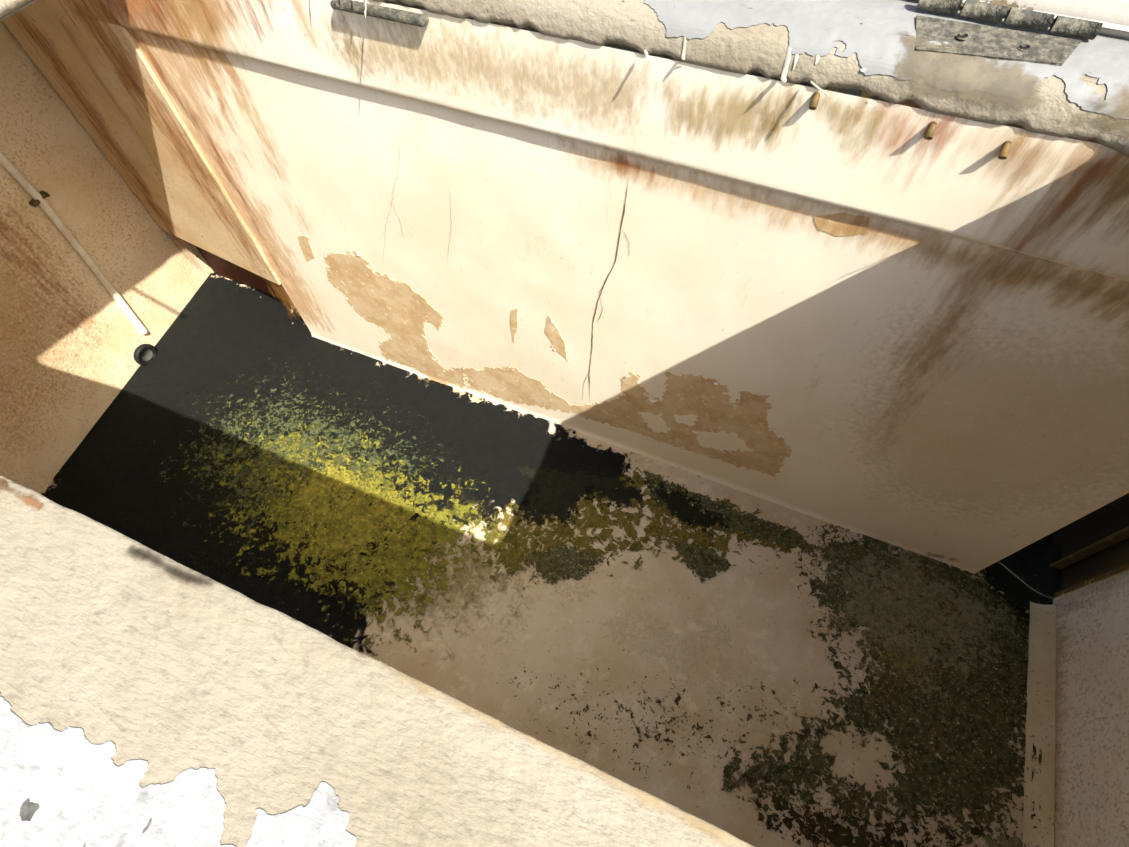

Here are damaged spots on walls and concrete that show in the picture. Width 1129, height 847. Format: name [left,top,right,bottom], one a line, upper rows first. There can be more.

corrosion [74,0,231,224]
peeling [644,0,1129,119]
mould [41,271,730,655]
peeling [298,235,792,478]
crack [583,171,630,402]
peeling [814,213,870,236]
peeling [0,692,357,847]
mould [496,650,797,789]